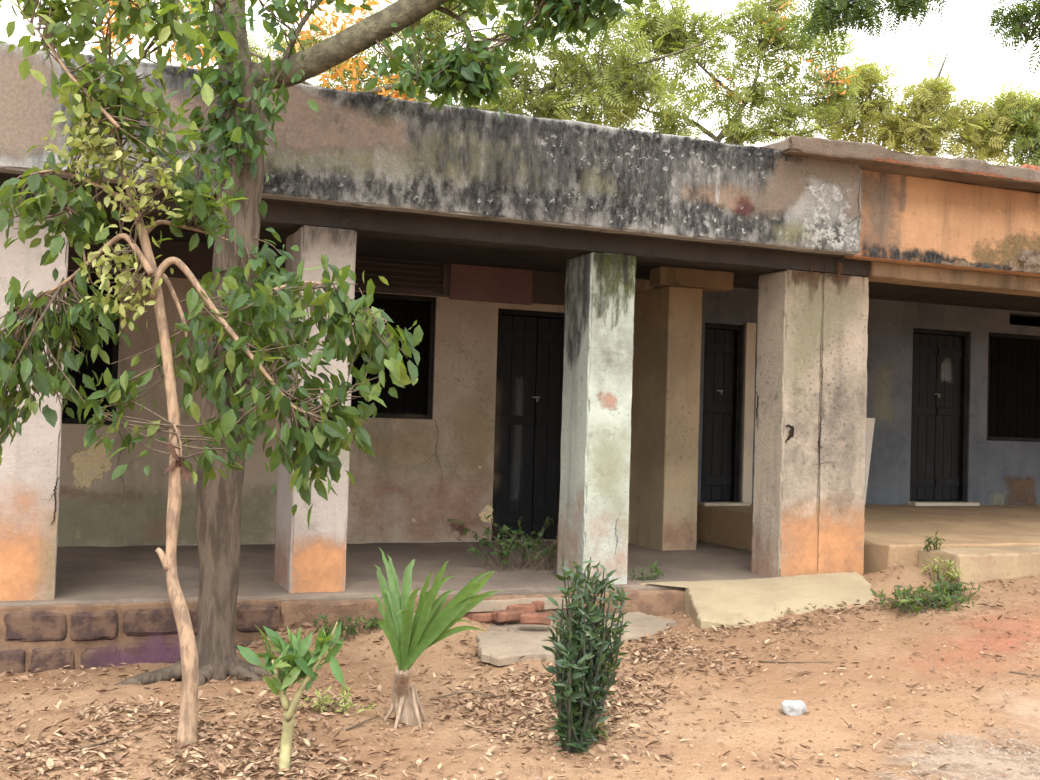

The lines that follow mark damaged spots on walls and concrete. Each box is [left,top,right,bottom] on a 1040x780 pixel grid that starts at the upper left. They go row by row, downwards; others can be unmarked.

leakage [99,157,176,182]
leakage [262,90,1023,301]
peeling [68,437,113,494]